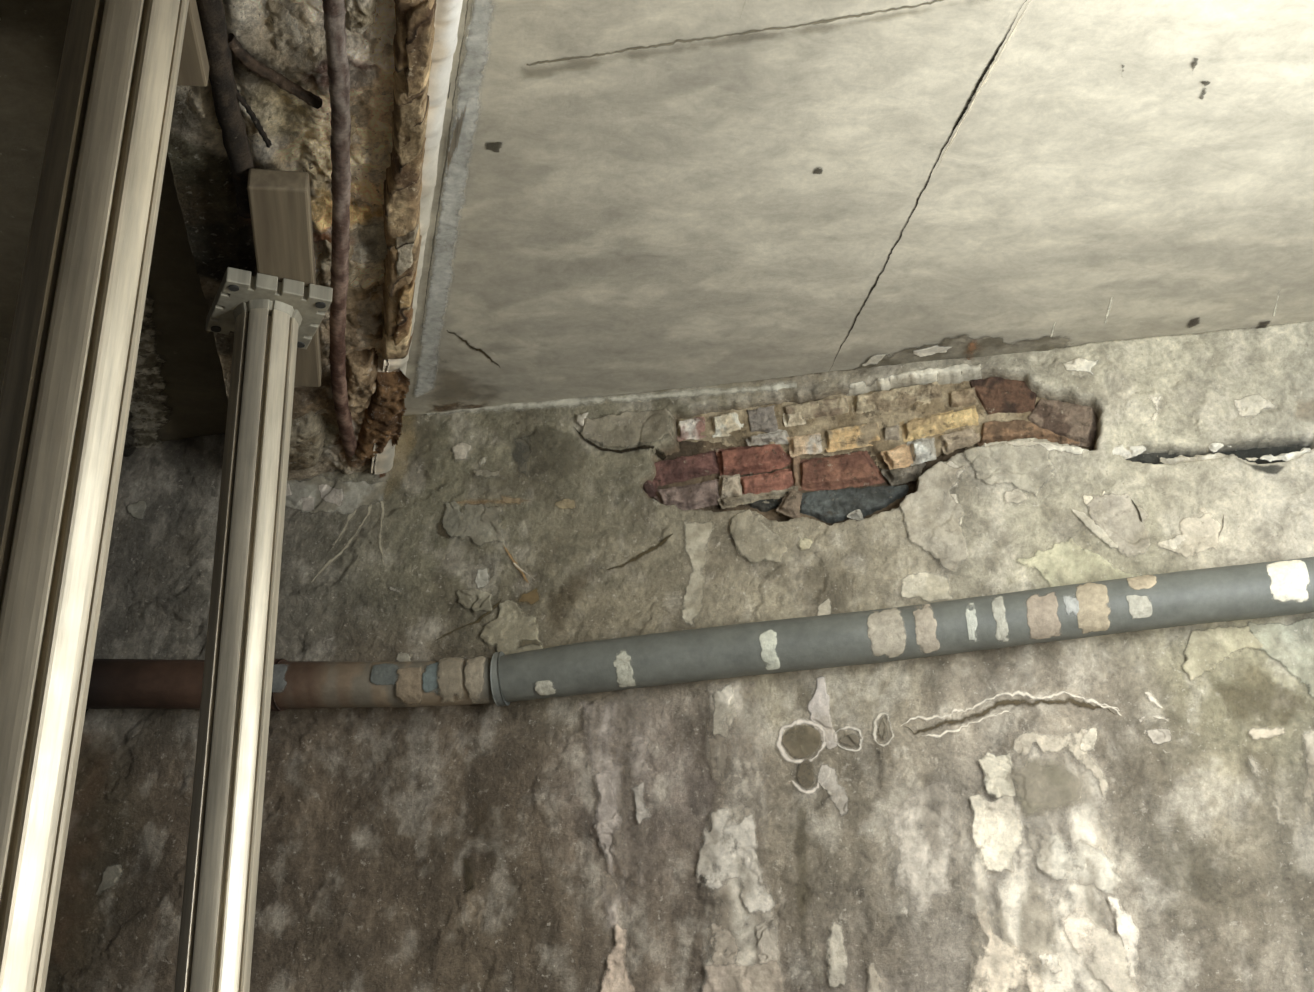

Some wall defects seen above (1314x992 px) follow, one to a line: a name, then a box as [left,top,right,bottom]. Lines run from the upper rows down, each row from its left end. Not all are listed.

crack [527,0,943,66]
spalling [167,77,257,313]
spalling [223,0,332,287]
spalling [287,0,410,481]
corrosion [381,0,436,360]
corrosion [448,108,466,167]
crack [829,0,1030,371]
spalling [123,284,172,457]
spalling [576,377,1098,572]
flaking render [1017,491,1221,587]
spalling [1112,443,1311,474]
crack [901,691,1168,737]